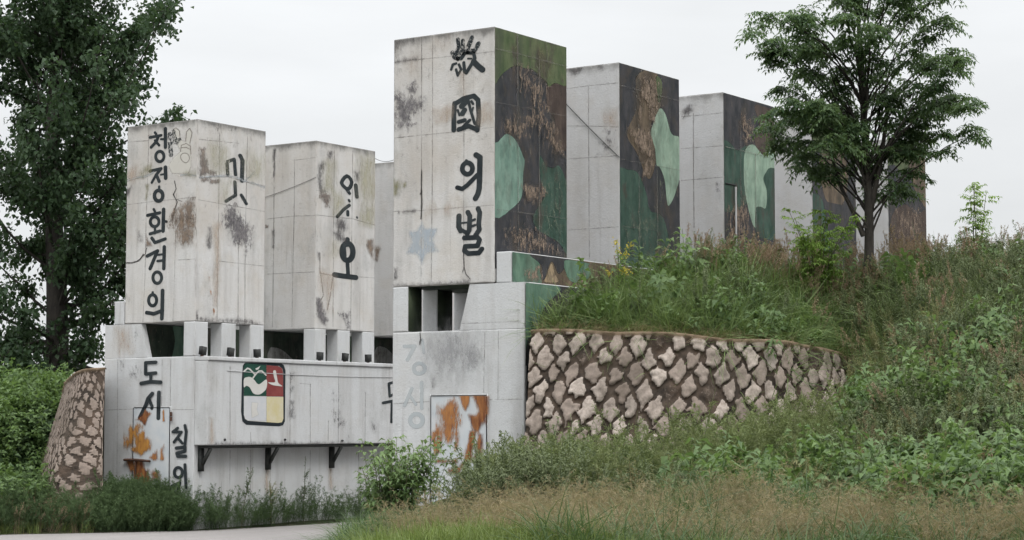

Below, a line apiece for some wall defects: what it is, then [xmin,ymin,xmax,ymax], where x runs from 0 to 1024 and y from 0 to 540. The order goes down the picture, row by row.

corrosion [123,410,164,483]
corrosion [431,396,489,473]